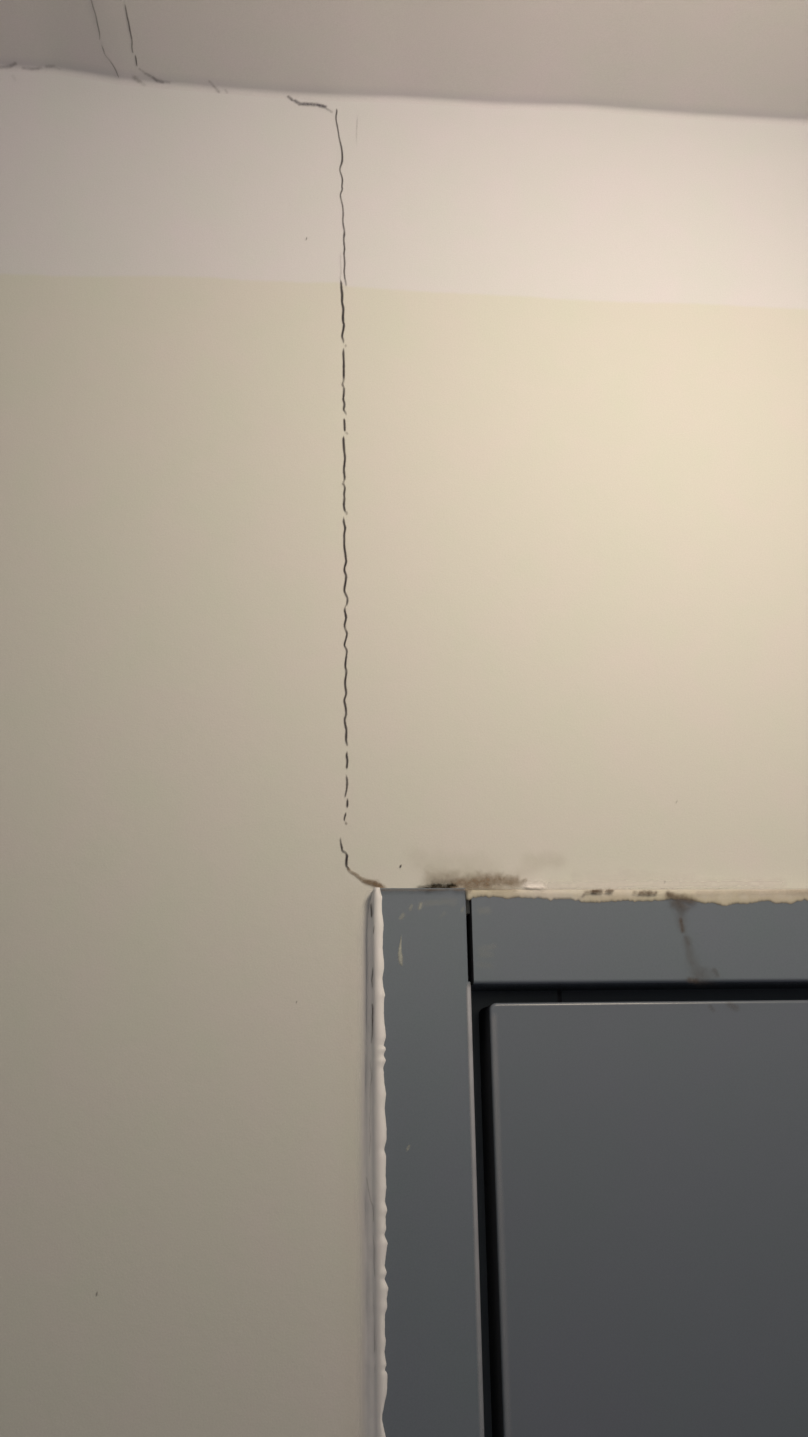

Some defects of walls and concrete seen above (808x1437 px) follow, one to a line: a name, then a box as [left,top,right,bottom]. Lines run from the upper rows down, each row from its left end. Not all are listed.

crack [291,99,381,932]